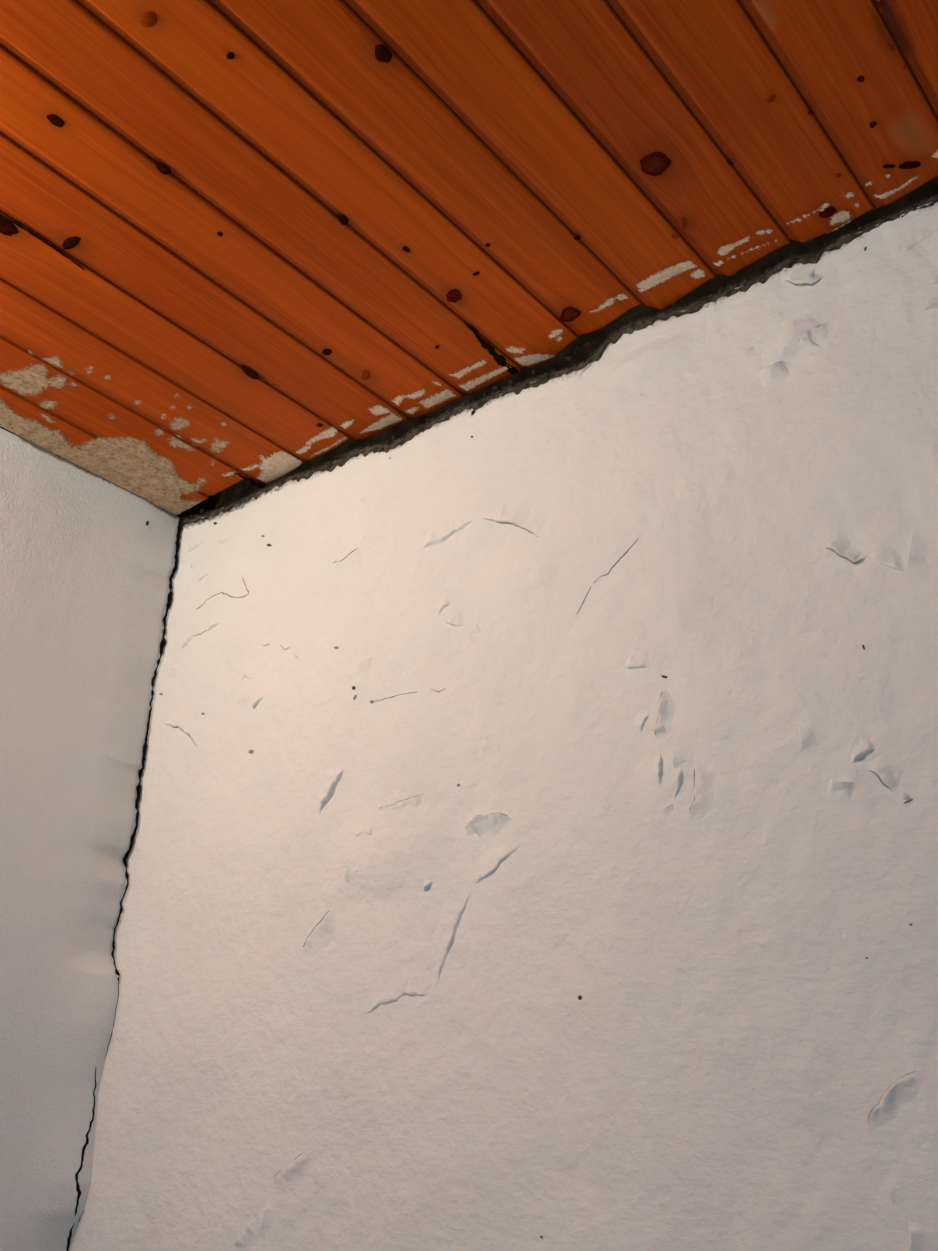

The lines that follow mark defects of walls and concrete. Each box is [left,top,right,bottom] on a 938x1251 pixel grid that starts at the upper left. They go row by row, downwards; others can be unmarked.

flaking render [182,174,938,526]
crack [785,278,820,286]
crack [66,518,249,1251]